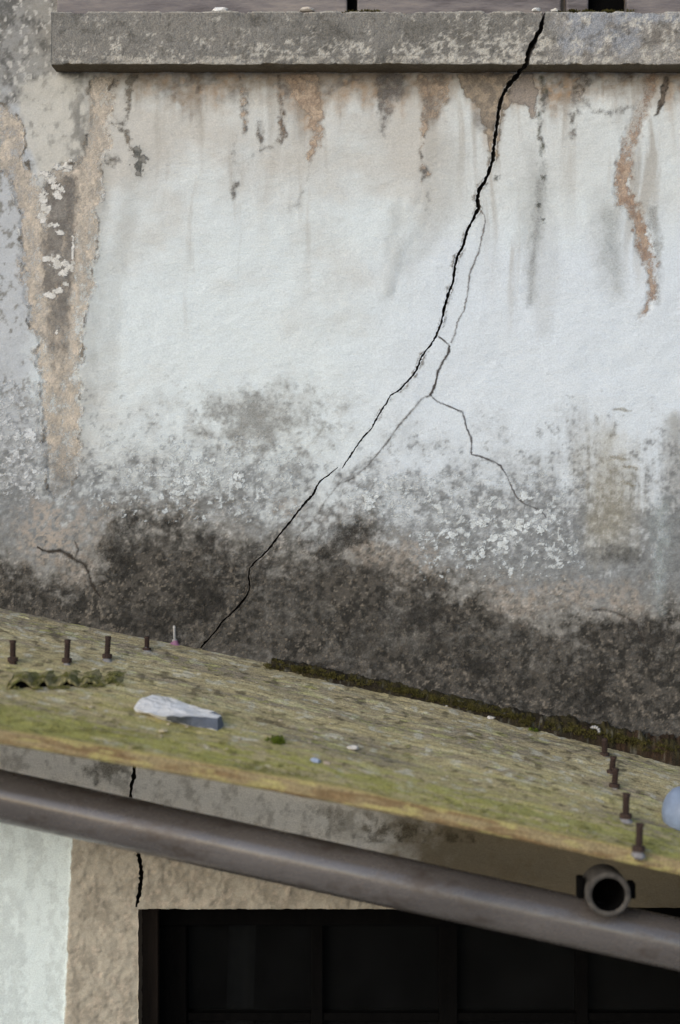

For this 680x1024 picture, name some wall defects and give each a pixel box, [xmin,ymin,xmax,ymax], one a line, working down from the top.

leakage [111,75,138,149]
leakage [240,77,263,151]
leakage [278,74,324,160]
leakage [416,74,449,178]
leakage [537,76,548,148]
rust [614,73,669,313]
peeling [0,77,302,522]
crack [199,13,546,649]
crack [37,546,101,598]
leakage [0,506,680,738]
crack [128,767,136,798]
crack [135,853,144,907]